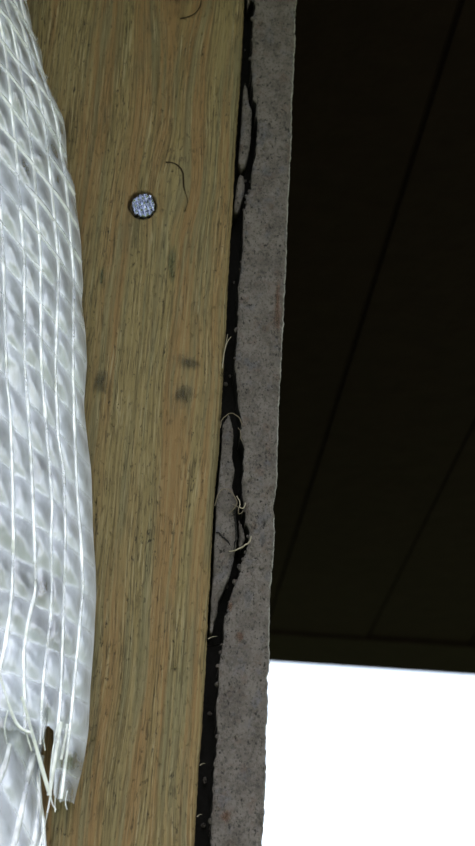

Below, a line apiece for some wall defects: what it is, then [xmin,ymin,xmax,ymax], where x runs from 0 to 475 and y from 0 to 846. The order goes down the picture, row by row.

crack [231,0,258,231]
crack [207,415,250,646]